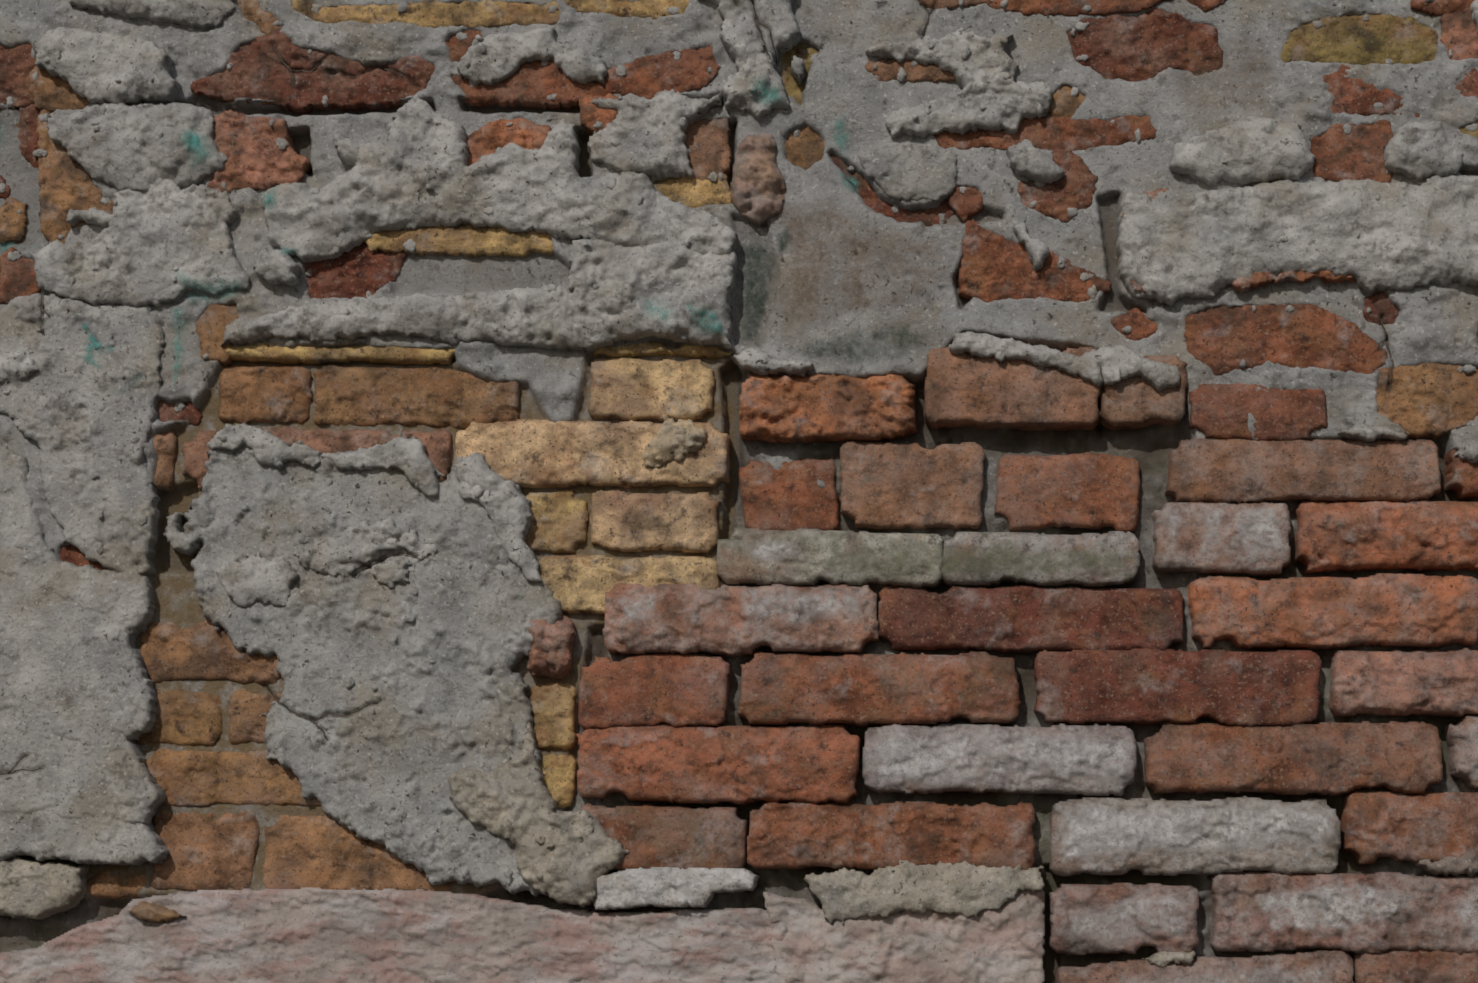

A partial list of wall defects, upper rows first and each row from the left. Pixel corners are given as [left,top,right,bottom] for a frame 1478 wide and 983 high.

spalling [1280,0,1478,66]
spalling [1310,120,1394,183]
spalling [1459,122,1478,138]
spalling [1184,269,1478,442]
flaking render [0,0,1226,925]
crack [341,552,417,575]
crack [263,684,381,740]
flaking render [1414,851,1478,878]
flaking render [1141,950,1196,968]